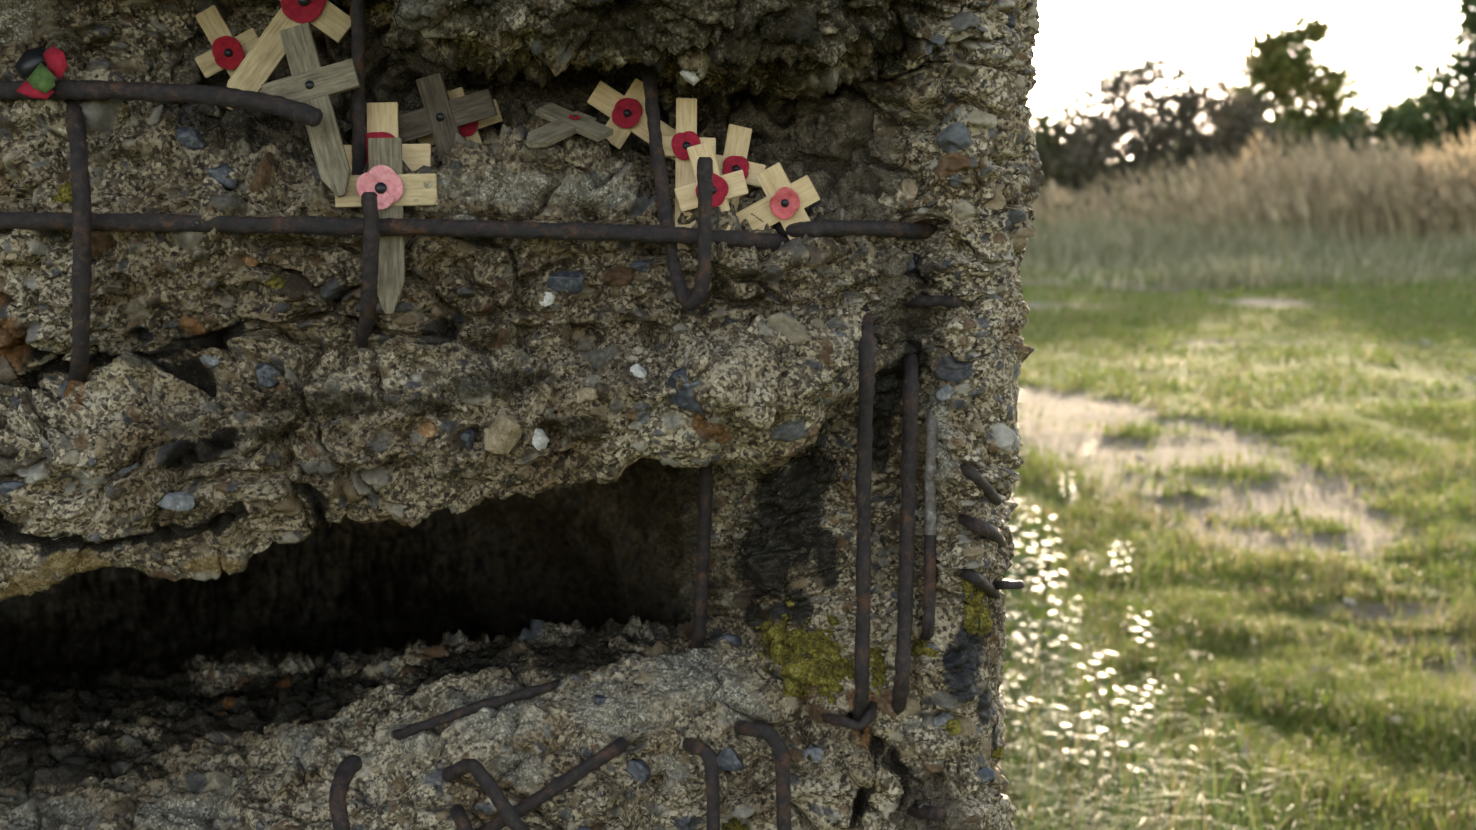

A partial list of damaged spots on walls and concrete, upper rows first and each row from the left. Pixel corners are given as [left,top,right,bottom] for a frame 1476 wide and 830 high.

corrosion [0,0,937,408]
spalling [0,442,48,478]
corrosion [960,464,1002,506]
corrosion [821,304,938,750]
corrosion [957,514,1006,548]
corrosion [960,569,1025,600]
corrosion [388,679,560,740]
corrosion [329,754,363,830]
corrosion [441,737,629,830]
corrosion [682,738,720,830]
corrosion [734,720,792,830]